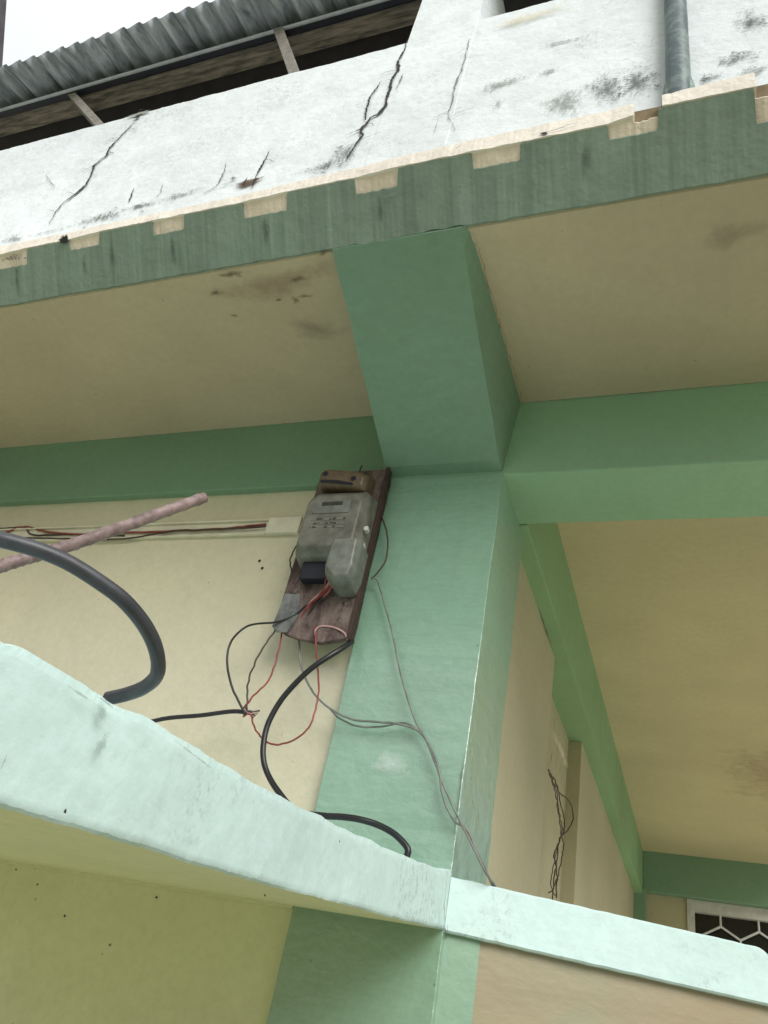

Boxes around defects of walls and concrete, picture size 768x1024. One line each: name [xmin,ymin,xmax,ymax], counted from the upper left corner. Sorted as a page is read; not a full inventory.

crack [346,40,408,159]
crack [437,39,474,130]
water stain [548,66,659,115]
crack [46,115,140,224]